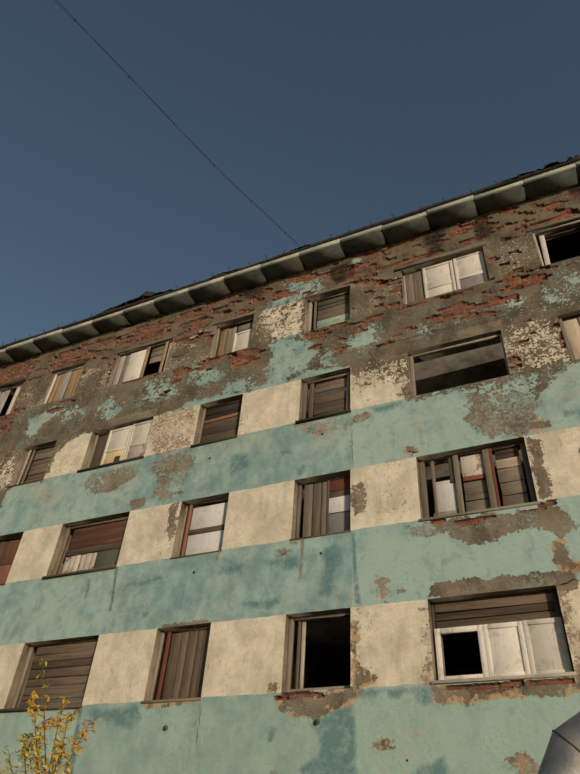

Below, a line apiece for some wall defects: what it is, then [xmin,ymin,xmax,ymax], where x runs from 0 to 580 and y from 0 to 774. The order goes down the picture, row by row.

peeling [0,185,580,720]
peeling [372,736,396,754]
peeling [504,750,540,774]